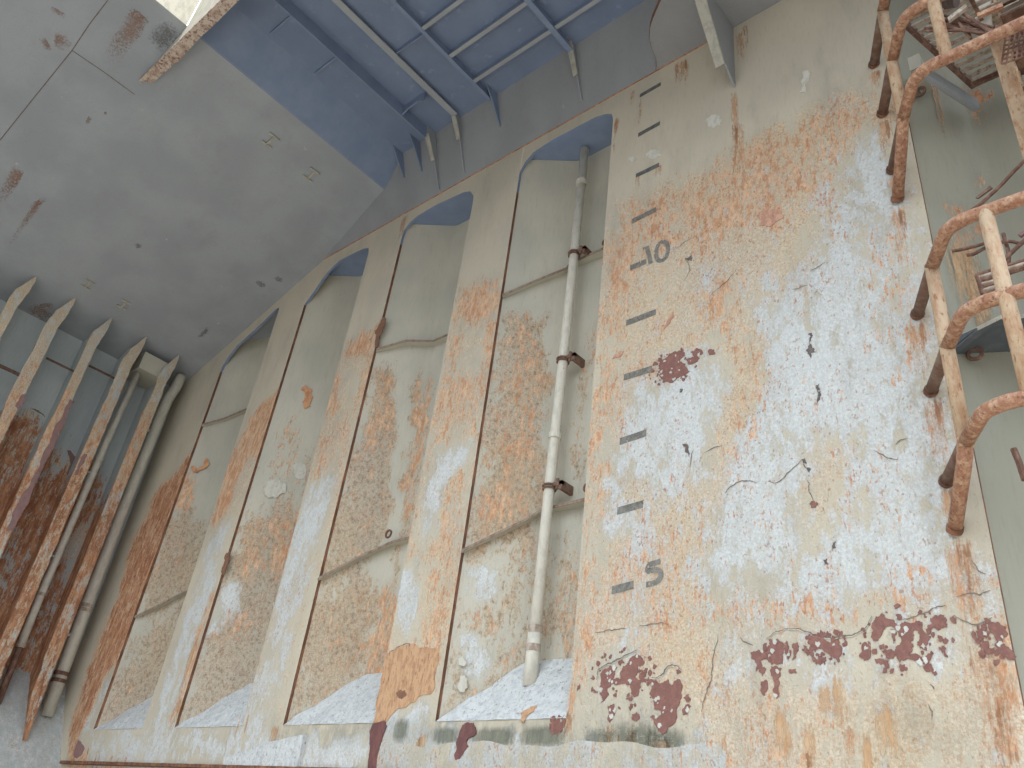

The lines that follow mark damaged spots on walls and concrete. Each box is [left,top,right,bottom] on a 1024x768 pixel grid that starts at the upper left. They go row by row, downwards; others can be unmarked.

peeling [649,347,715,392]
rust [301,385,314,409]
crack [725,462,814,501]
rust [221,552,231,576]
peeling [751,603,957,699]
peeling [971,618,1017,666]
peeling [368,643,439,768]
peeling [549,715,566,737]
peeling [577,647,691,734]